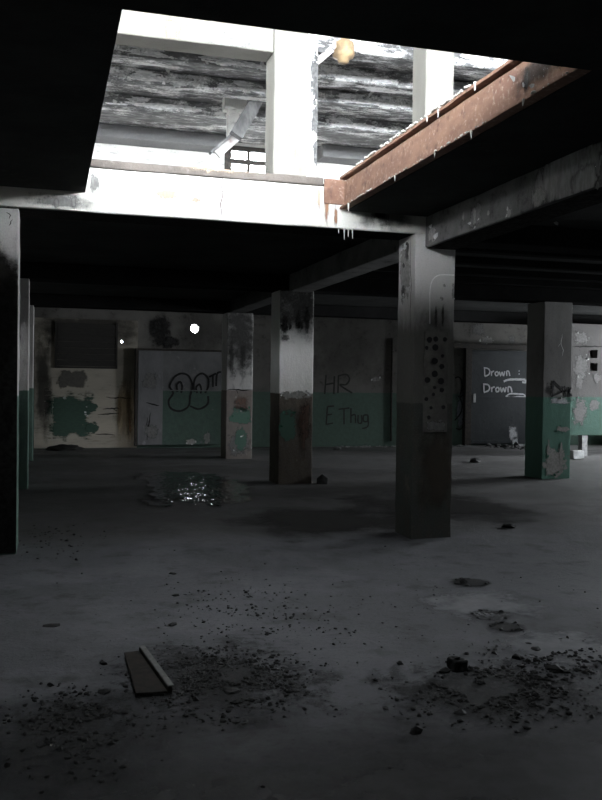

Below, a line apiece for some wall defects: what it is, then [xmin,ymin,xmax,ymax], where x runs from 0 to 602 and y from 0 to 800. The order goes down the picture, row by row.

rust [509,63,561,92]
rust [318,192,337,224]
peeling [542,332,602,479]